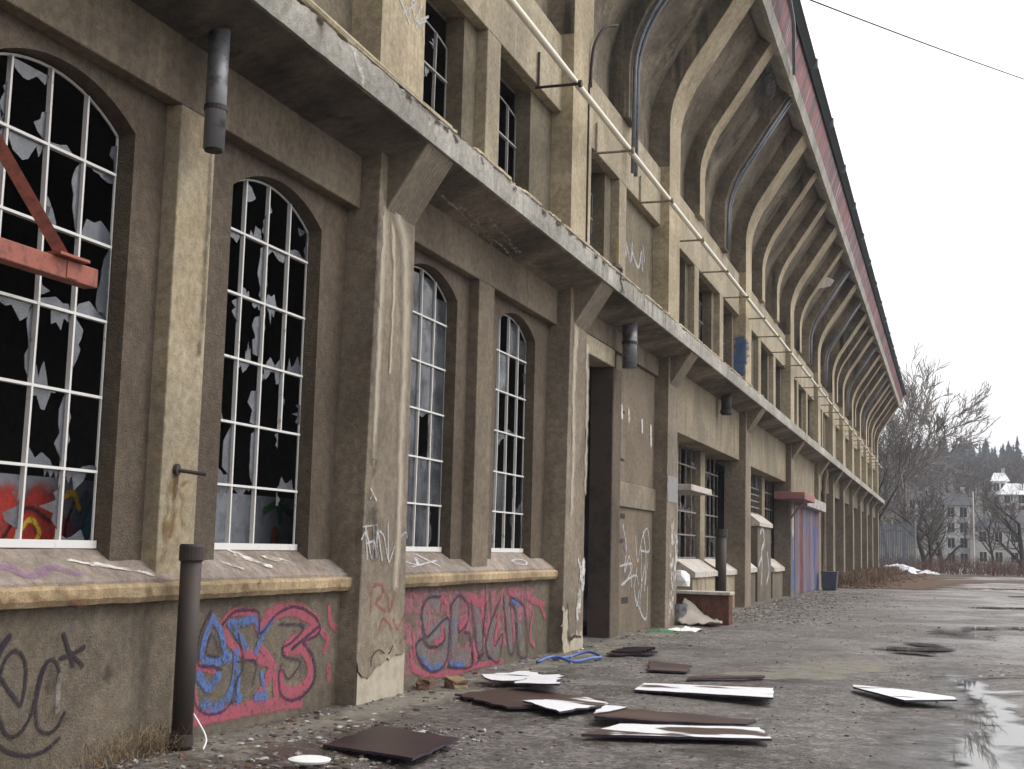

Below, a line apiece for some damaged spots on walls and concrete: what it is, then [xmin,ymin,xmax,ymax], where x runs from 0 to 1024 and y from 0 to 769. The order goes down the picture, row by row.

leakage [372,213,409,588]
flaking render [561,558,585,653]
flaking render [356,639,436,706]